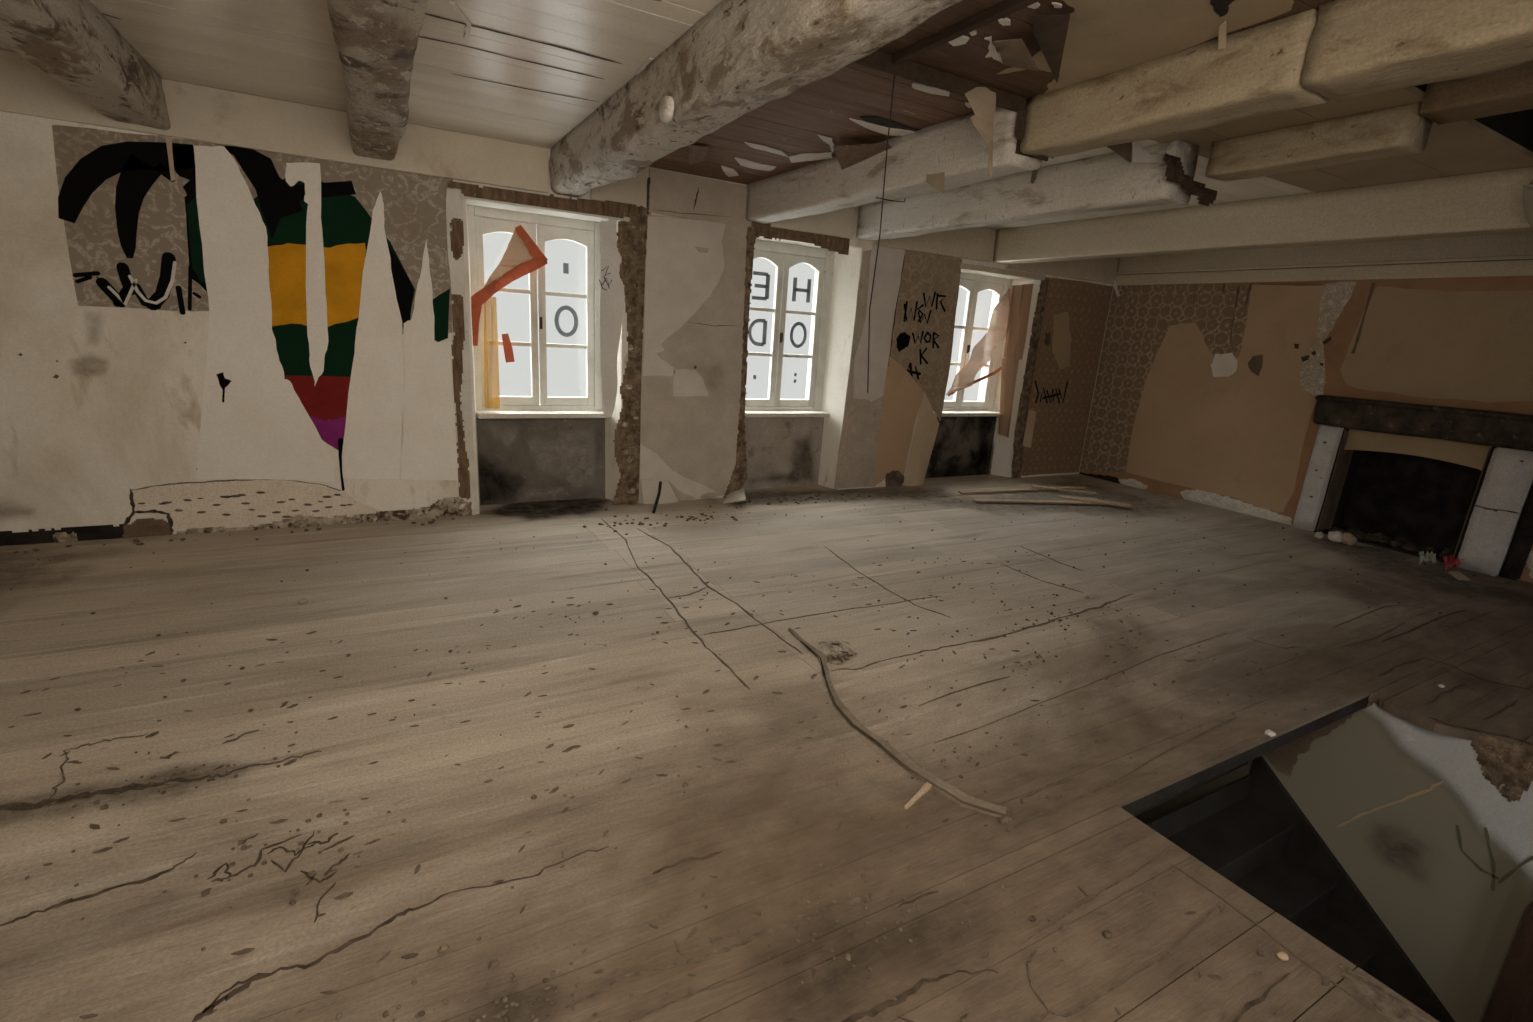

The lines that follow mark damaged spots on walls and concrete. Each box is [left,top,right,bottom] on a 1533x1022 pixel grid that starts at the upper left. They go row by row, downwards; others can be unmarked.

peeling [948,2,1070,83]
peeling [721,118,915,177]
peeling [912,82,996,179]
peeling [450,218,464,260]
peeling [599,199,756,505]
peeling [853,240,905,402]
peeling [1211,353,1263,377]
peeling [0,294,472,546]
peeling [885,391,939,487]
crack [602,519,1131,689]
crack [0,730,322,811]
crack [0,832,609,1022]